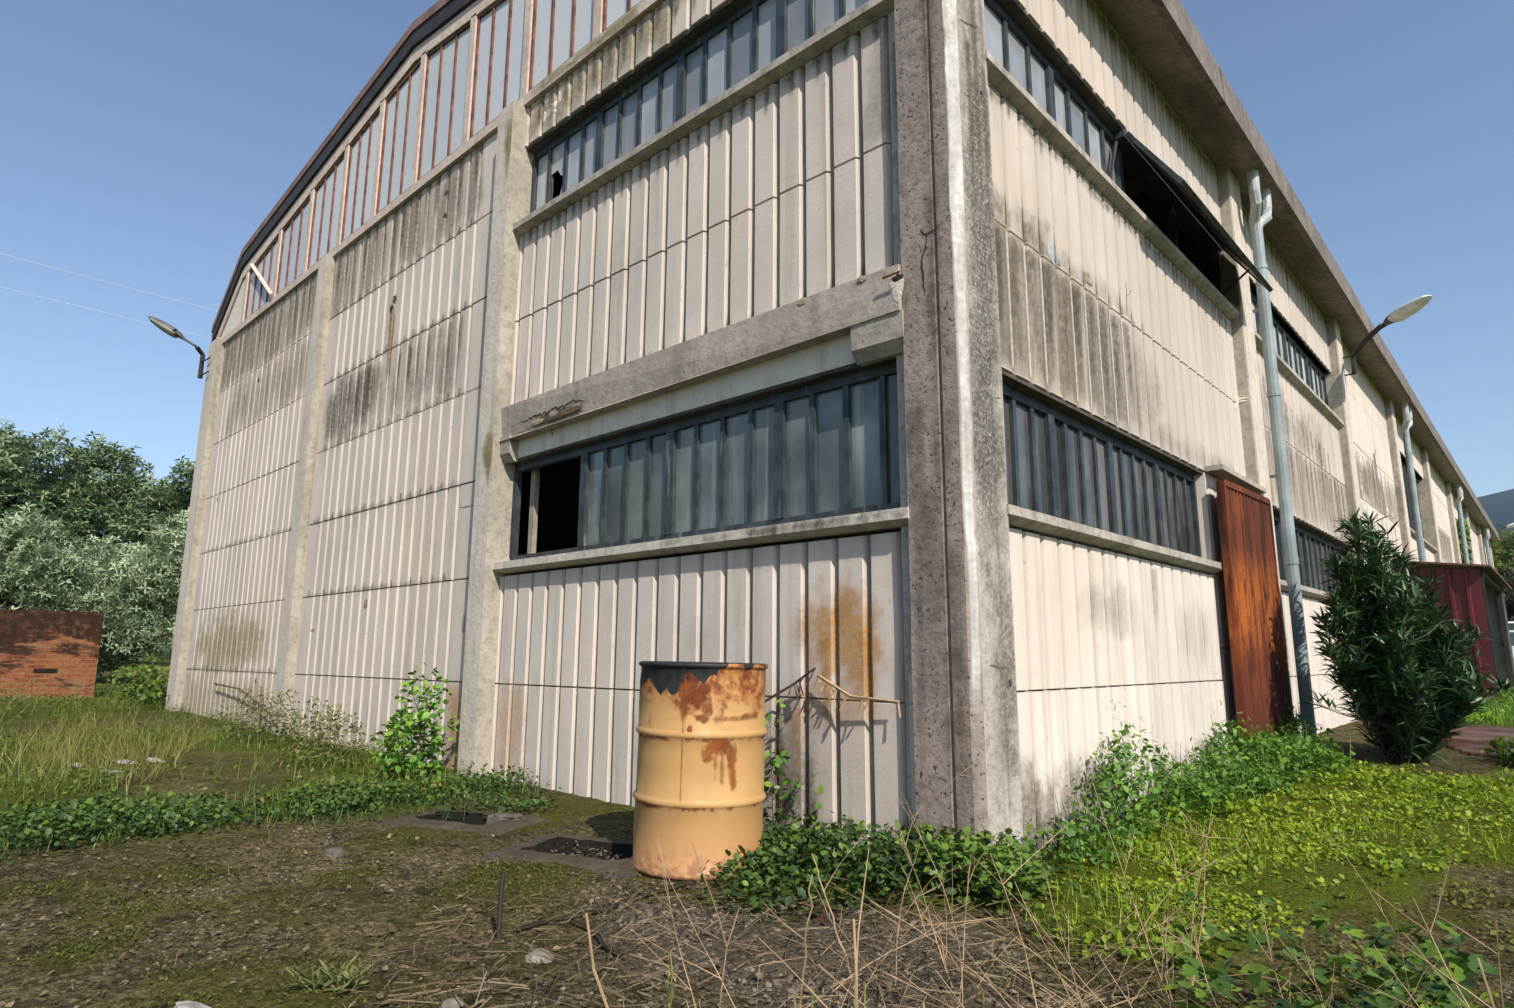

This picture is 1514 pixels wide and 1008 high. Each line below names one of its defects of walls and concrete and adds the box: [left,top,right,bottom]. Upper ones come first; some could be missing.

water stain [336,148,480,301]
water stain [221,277,317,389]
water stain [326,364,375,437]
water stain [925,0,1132,717]
water stain [1356,461,1395,516]
rust [806,589,880,694]